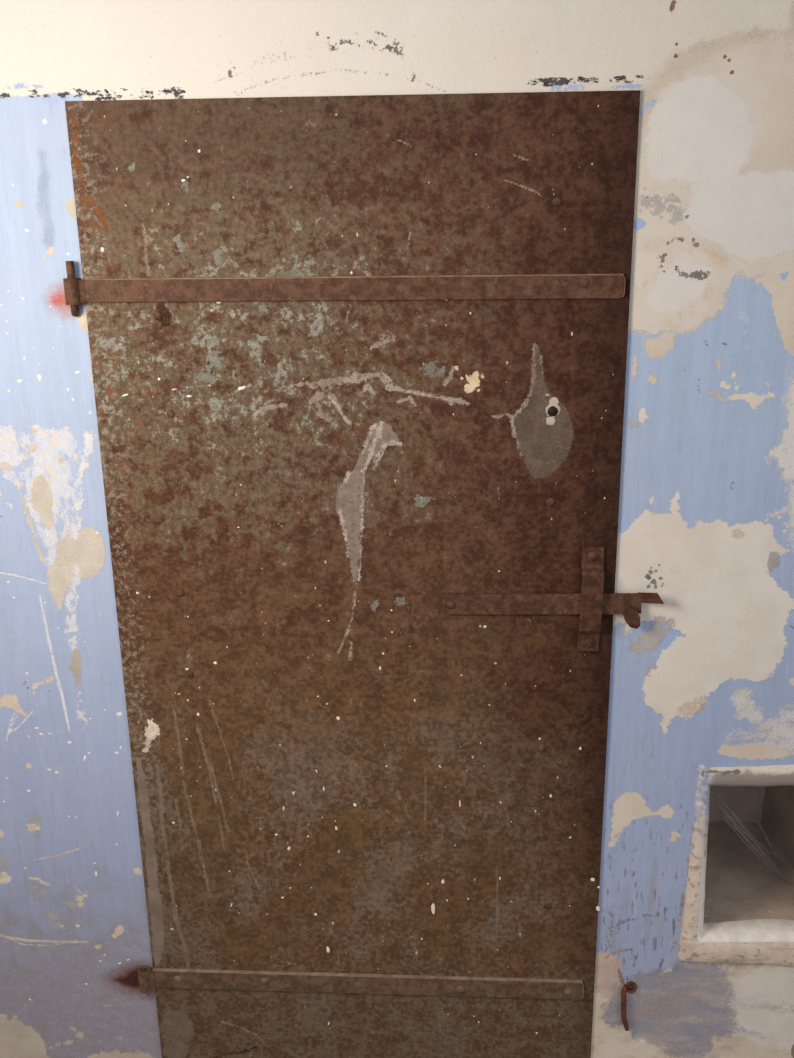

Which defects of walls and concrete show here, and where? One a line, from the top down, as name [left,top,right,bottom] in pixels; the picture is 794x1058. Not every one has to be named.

corrosion [68,111,108,232]
leakage [639,187,689,225]
corrosion [38,275,85,325]
peeling [629,232,740,385]
peeling [754,265,794,356]
peeling [707,359,776,409]
peeling [0,424,106,730]
peeling [613,614,626,626]
peeling [615,489,794,734]
peeling [608,791,674,847]
flaking render [591,825,794,1058]
flaking render [0,1014,84,1058]